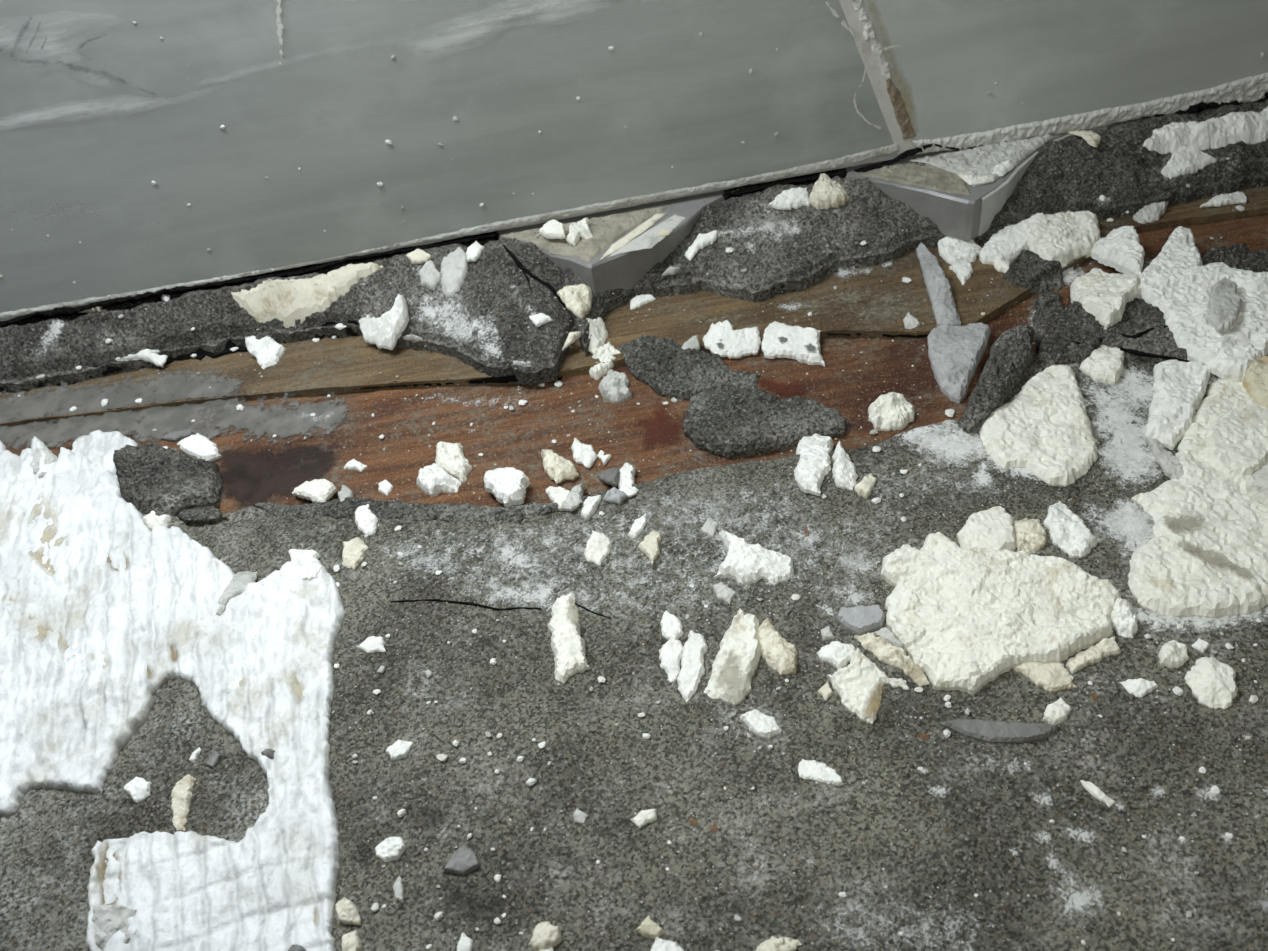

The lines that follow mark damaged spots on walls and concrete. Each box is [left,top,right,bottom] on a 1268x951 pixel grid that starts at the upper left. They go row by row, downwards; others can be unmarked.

spalling [1161,146,1217,180]
spalling [1133,201,1168,224]
spalling [539,218,593,246]
spalling [662,230,719,276]
spalling [1080,344,1125,385]
spalling [177,433,222,461]
damp [220,443,334,508]
crack [390,599,542,611]
crack [575,603,611,619]
spalling [124,777,152,804]
spalling [171,747,222,831]
spalling [335,897,363,951]